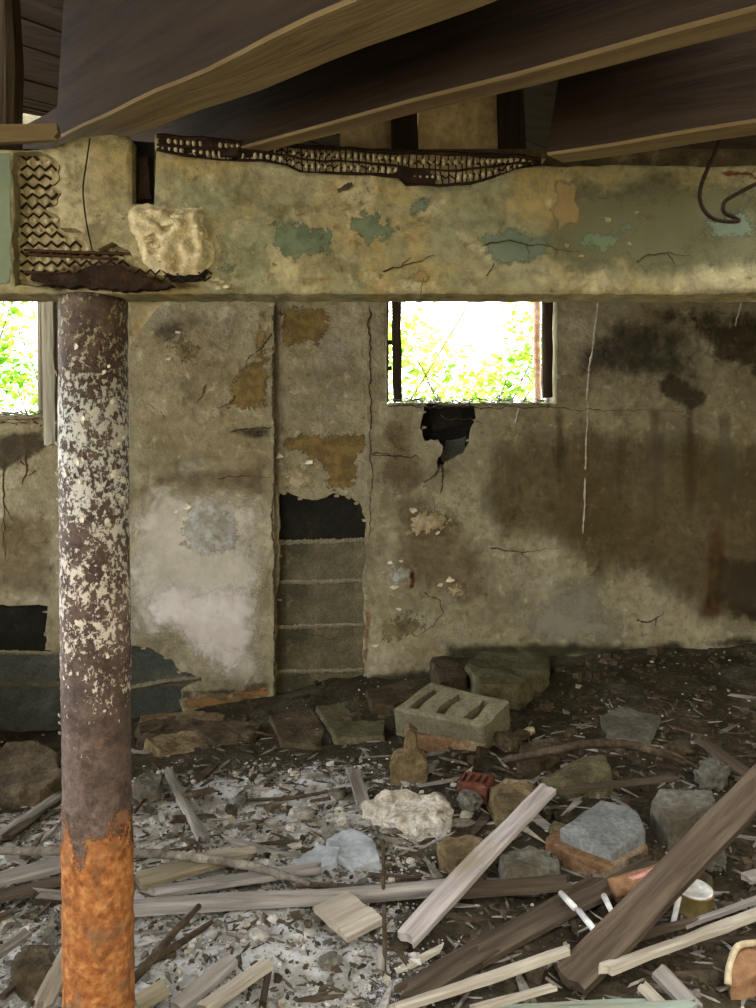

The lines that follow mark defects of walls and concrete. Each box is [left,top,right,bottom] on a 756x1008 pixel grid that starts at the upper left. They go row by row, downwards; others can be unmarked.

flaking render [133,133,545,266]
crack [483,240,579,276]
water stain [0,432,45,469]
flaking render [0,150,239,732]
peeling [222,302,335,416]
flaking render [420,404,477,493]
crack [367,307,693,535]
water stain [491,302,756,620]
water stain [130,489,266,698]
flaking render [275,429,427,693]
water stain [448,584,621,658]
corrosion [60,809,135,1008]